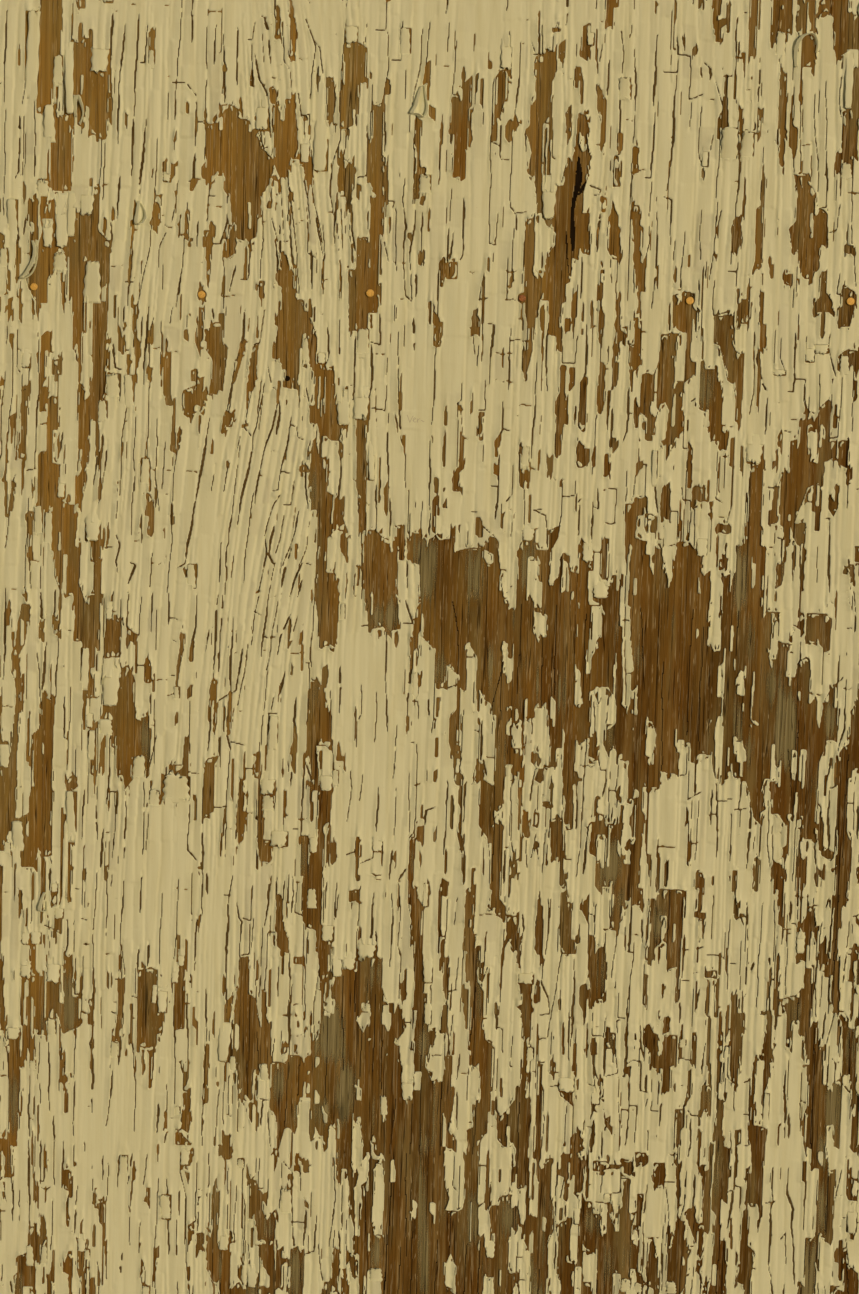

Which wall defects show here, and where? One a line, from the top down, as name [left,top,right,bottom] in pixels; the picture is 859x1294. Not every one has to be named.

peeling [0,0,393,1199]
crack [0,0,475,1294]
peeling [107,167,859,1294]
peeling [409,0,623,391]
crack [330,601,859,1158]
crack [457,317,733,553]
crack [479,0,856,316]
peeling [698,0,768,163]
crack [749,290,854,439]
peeling [770,0,859,363]
peeling [13,1096,107,1294]
crack [434,967,520,1294]